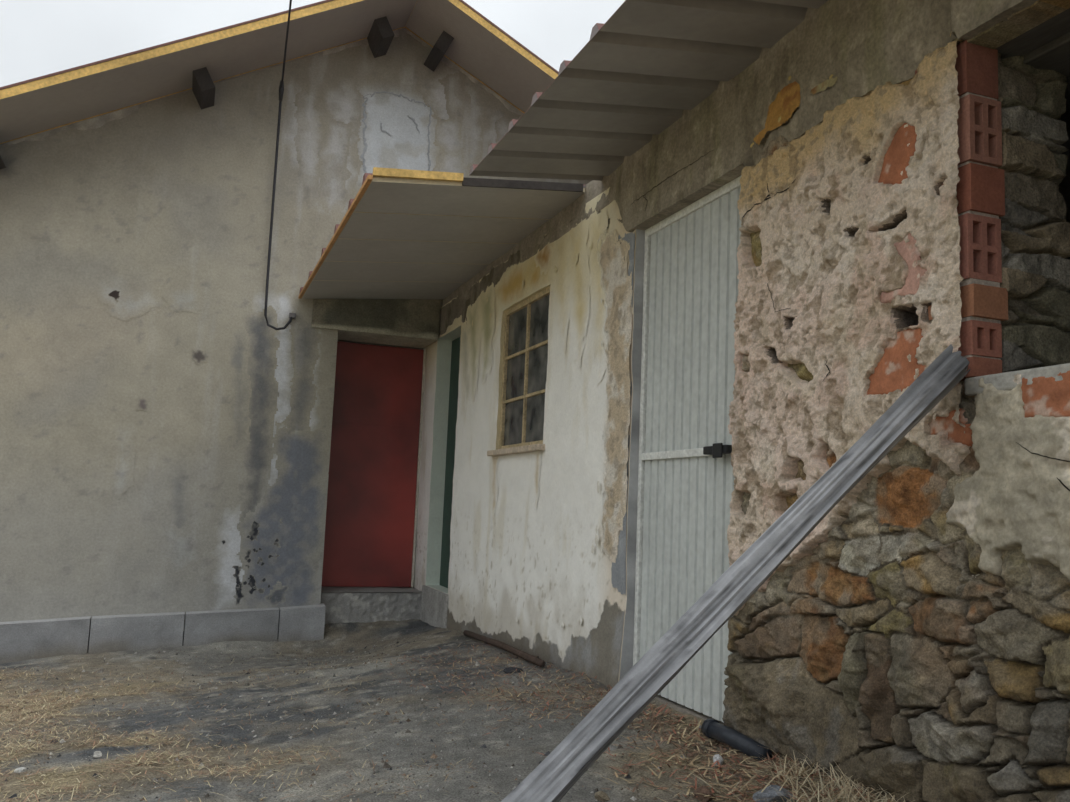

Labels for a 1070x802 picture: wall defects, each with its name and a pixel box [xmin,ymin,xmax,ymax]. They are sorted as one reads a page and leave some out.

spalling [750,74,837,148]
spalling [878,123,917,186]
leakage [96,274,204,321]
spalling [864,328,926,395]
spalling [1013,370,1070,418]
leakage [161,288,328,611]
spalling [439,209,635,689]
spalling [919,409,973,446]
crack [1016,442,1070,491]